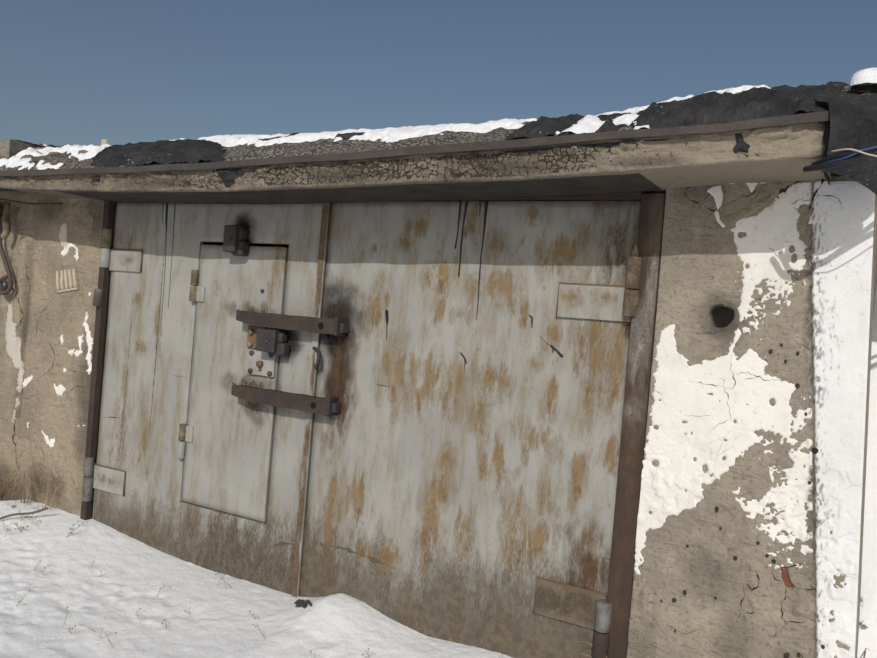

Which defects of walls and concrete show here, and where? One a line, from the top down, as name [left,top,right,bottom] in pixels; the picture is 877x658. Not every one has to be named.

crack [132,143,688,188]
crack [682,179,841,229]
peeling [58,223,79,261]
corrosion [315,203,328,316]
peeling [5,303,33,423]
crack [11,230,74,482]
peeling [60,312,93,375]
corrosion [382,353,463,407]
peeling [634,182,820,589]
corrosion [479,444,504,483]
corrosion [580,530,608,589]
crack [737,563,816,658]